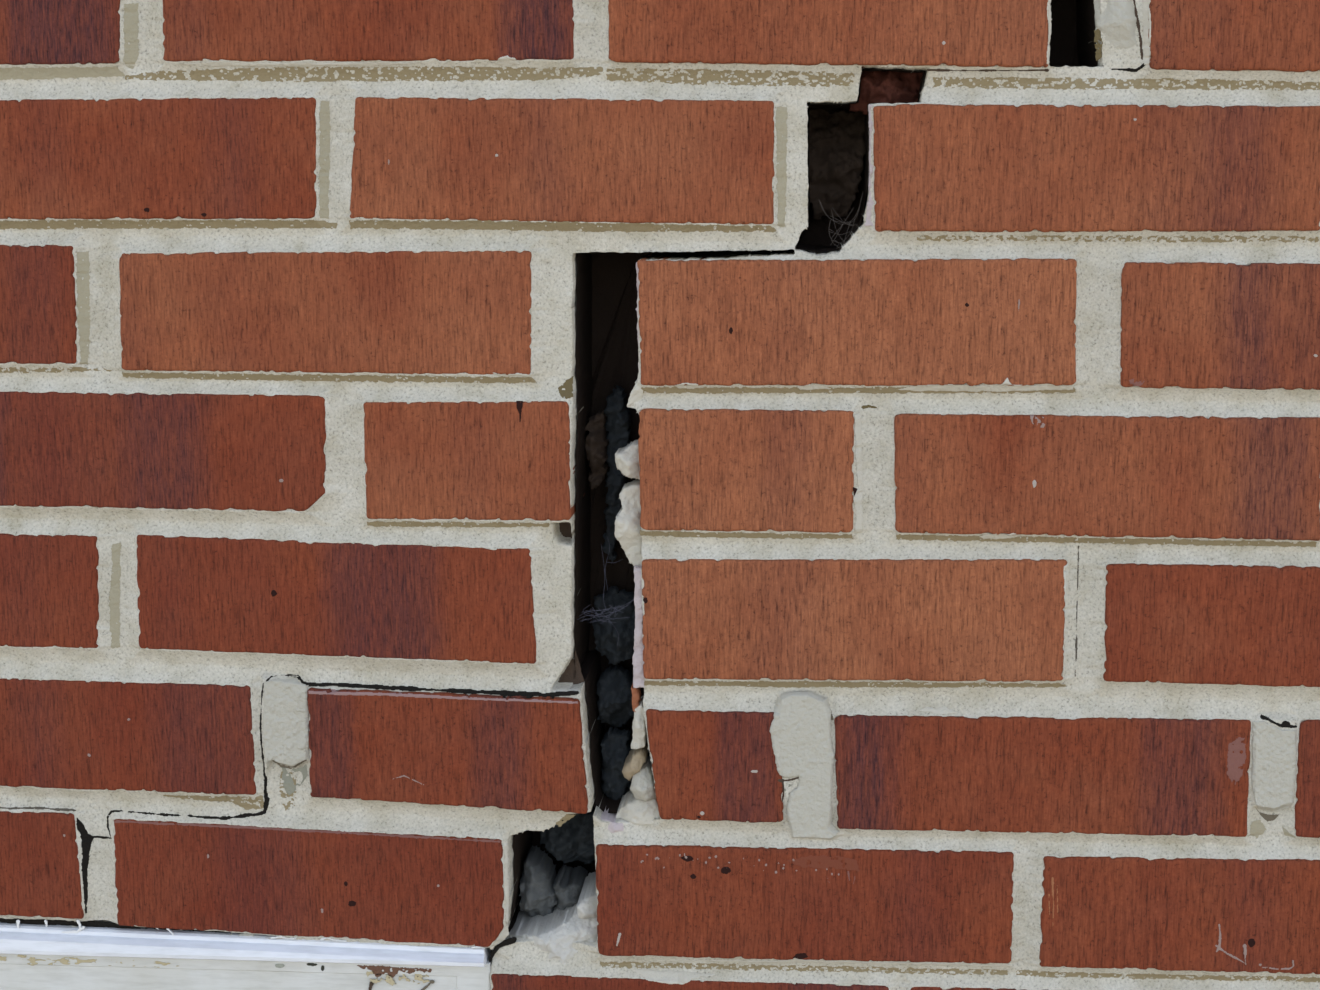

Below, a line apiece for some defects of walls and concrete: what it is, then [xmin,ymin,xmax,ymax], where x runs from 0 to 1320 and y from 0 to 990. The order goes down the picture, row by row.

crack [1111,0,1145,72]
crack [0,0,1097,934]
crack [489,830,596,966]